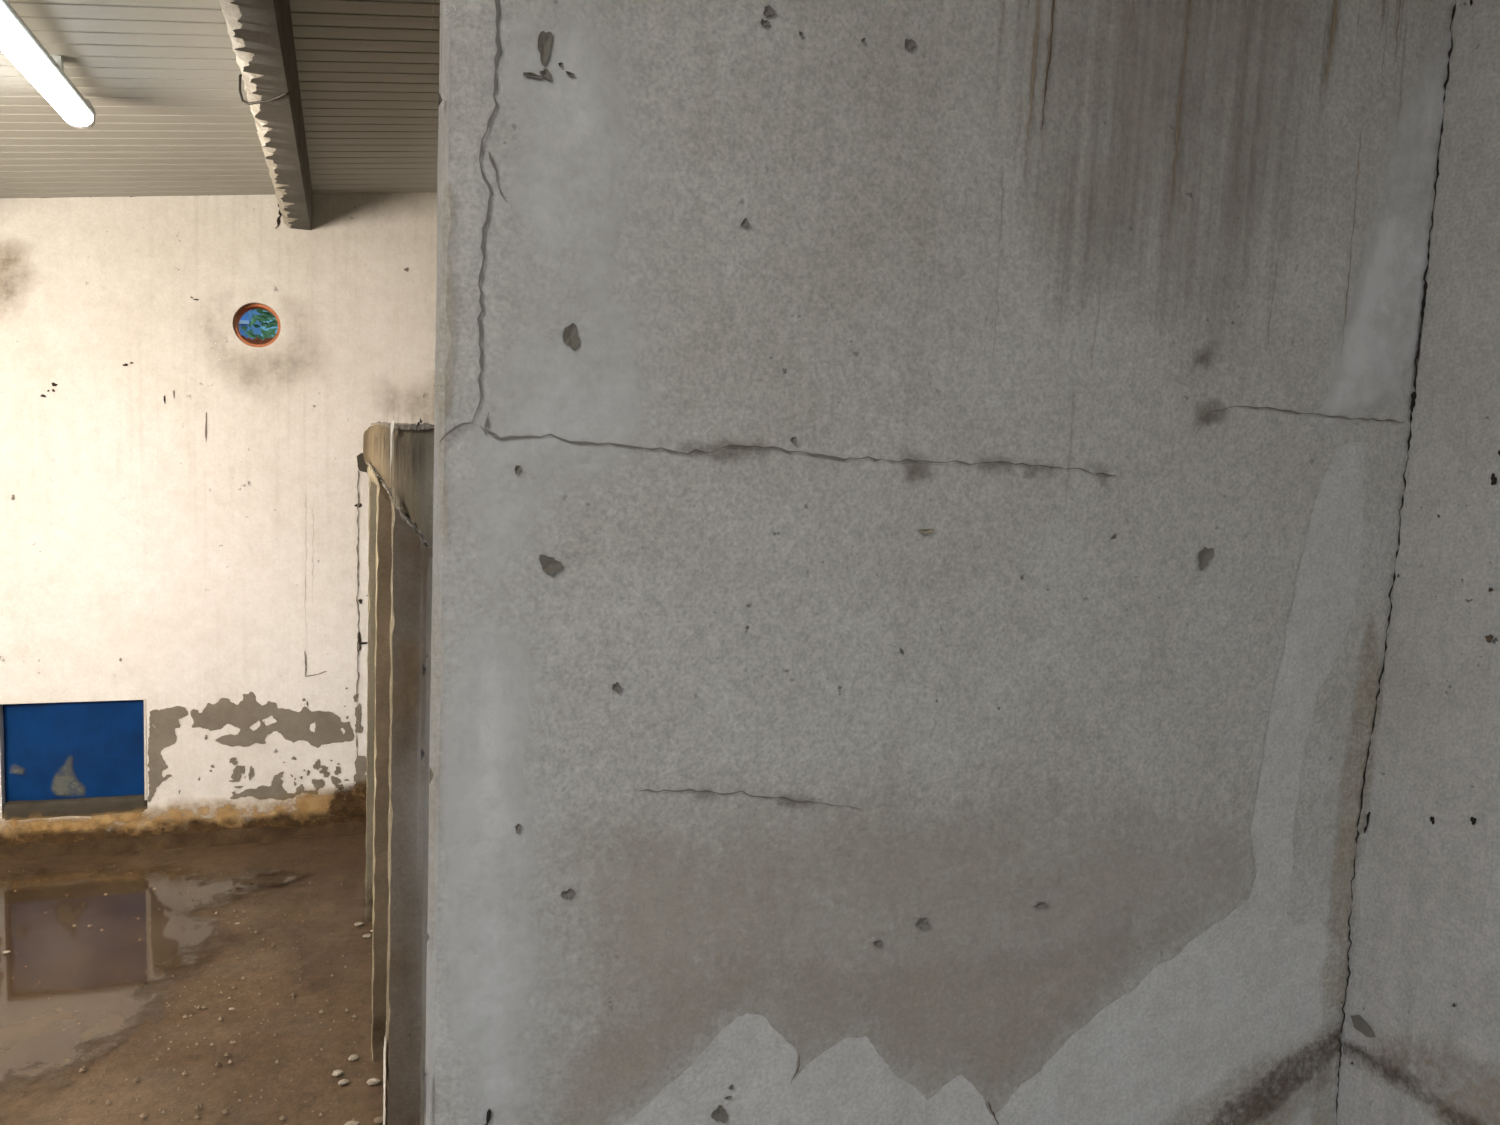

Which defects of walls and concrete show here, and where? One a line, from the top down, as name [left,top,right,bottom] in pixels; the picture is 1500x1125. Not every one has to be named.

crack [416,0,1116,476]
leakage [374,421,417,470]
peeling [147,687,367,802]
leakage [0,784,367,848]
peeling [711,1085,734,1123]